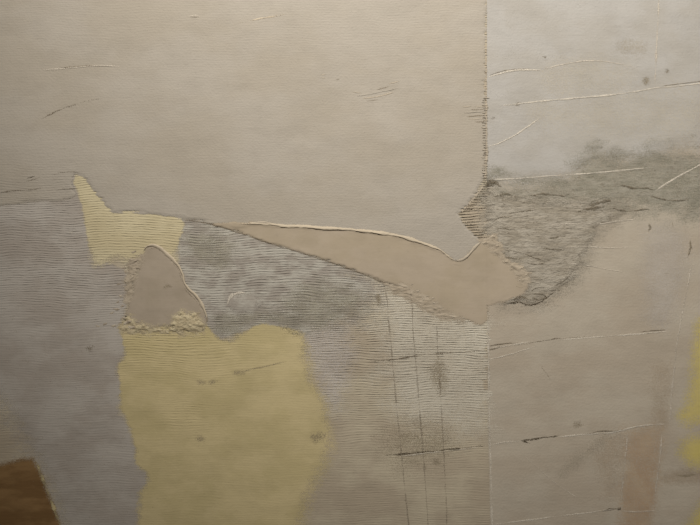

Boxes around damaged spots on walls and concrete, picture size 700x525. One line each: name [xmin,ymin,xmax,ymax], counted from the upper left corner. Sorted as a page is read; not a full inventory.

water stain [476,133,700,232]
spalling [103,301,209,338]
spalling [380,280,467,324]
crack [379,329,665,361]
crack [389,424,663,456]
peeling [0,456,62,525]